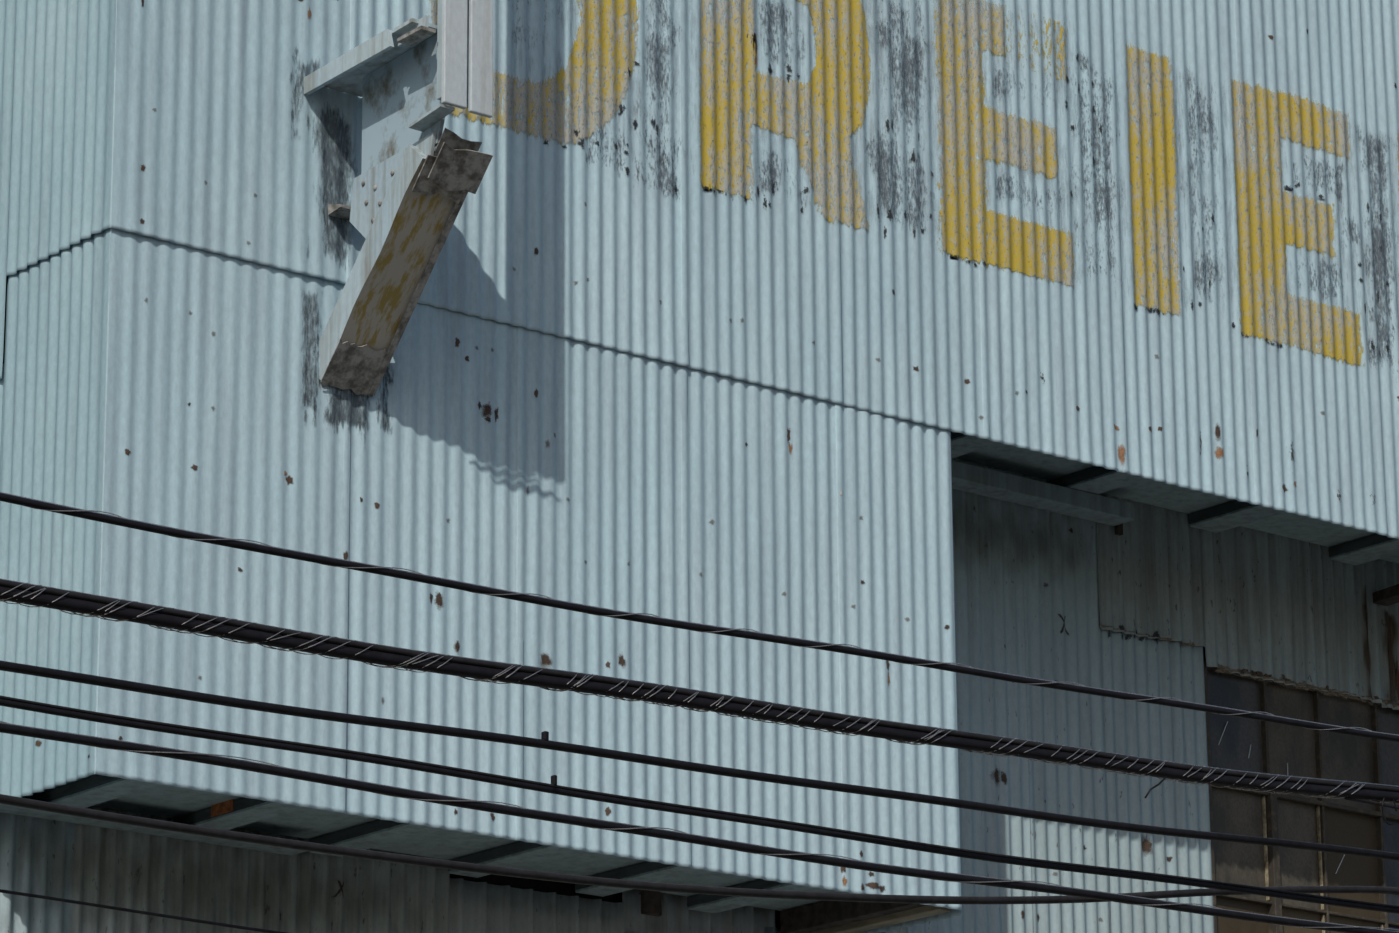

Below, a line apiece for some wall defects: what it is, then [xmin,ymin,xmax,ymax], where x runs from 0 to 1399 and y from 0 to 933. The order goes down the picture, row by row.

damp [291,50,354,263]
peeling [544,0,678,195]
peeling [703,152,780,208]
peeling [760,2,804,83]
peeling [866,6,934,238]
peeling [997,54,1123,229]
peeling [1187,80,1214,230]
peeling [1183,255,1218,310]
peeling [1286,160,1343,199]
peeling [1345,131,1394,362]
damp [303,295,393,432]